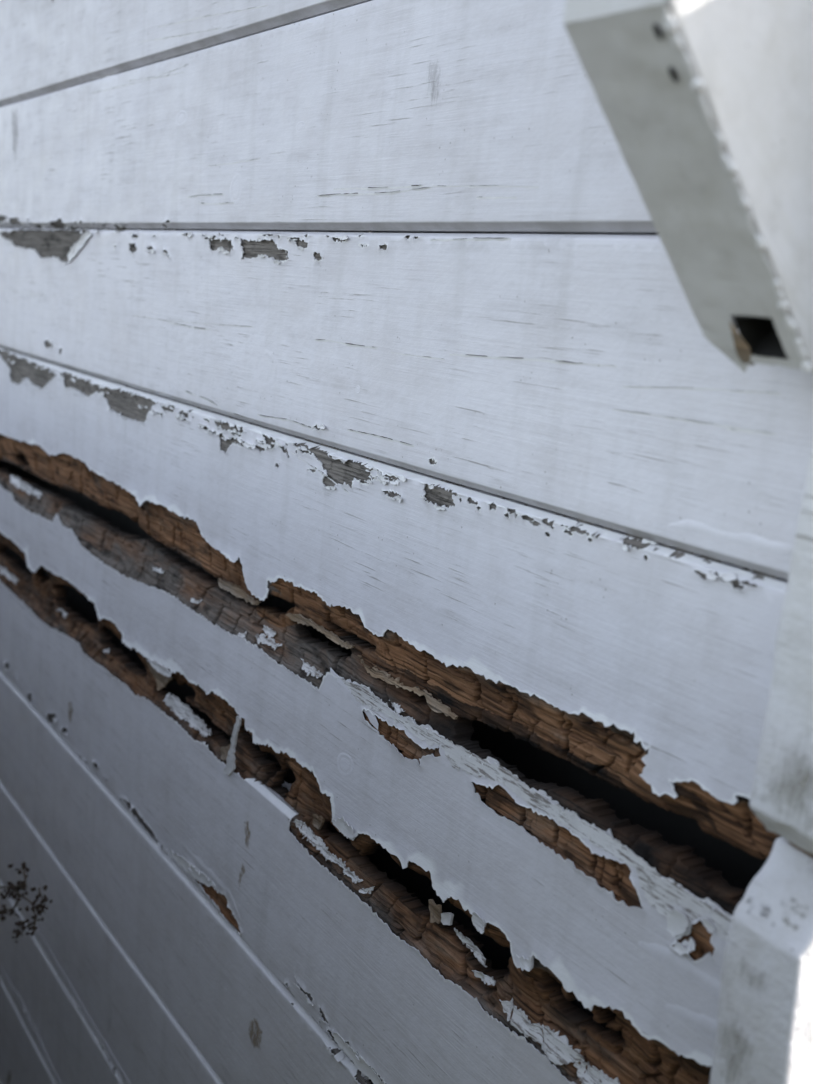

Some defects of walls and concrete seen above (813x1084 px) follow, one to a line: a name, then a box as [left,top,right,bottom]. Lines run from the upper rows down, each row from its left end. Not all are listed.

peeling [0,215,372,265]
peeling [419,479,613,542]
peeling [0,566,19,584]
peeling [622,533,776,589]
peeling [237,625,282,651]
peeling [147,659,172,677]
peeling [300,658,323,678]
peeling [48,713,67,736]
peeling [163,692,212,737]
peeling [389,700,416,723]
peeling [120,798,241,936]
peeling [286,983,386,1084]